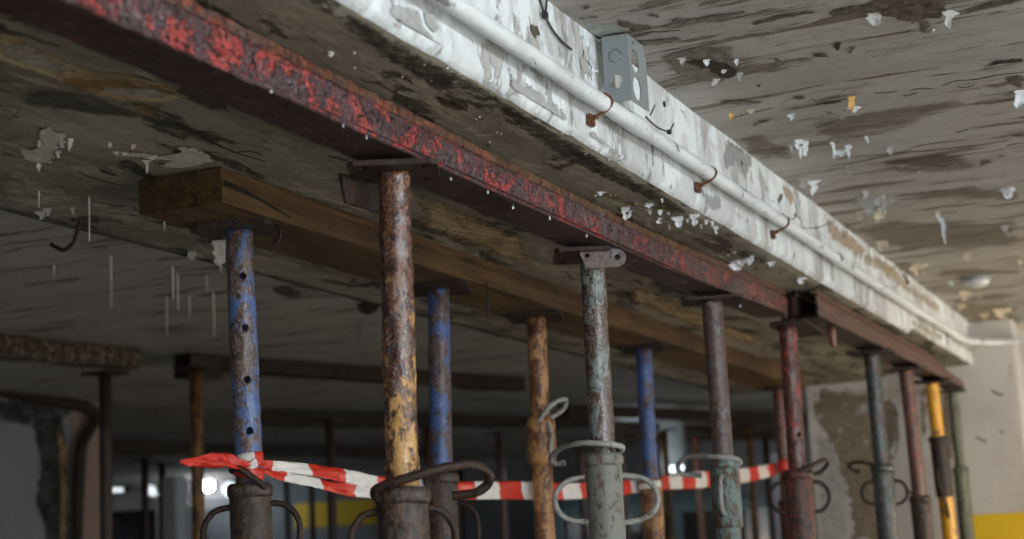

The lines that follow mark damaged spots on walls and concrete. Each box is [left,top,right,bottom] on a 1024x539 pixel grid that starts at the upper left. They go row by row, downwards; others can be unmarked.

spalling [831,0,1022,33]
spalling [344,15,527,119]
spalling [617,11,744,86]
corrosion [435,96,464,110]
peeling [1013,90,1024,108]
peeling [786,96,847,161]
peeling [20,127,74,177]
peeling [107,142,214,168]
peeling [829,142,852,159]
peeling [595,192,719,234]
peeling [721,251,776,270]
spalling [813,387,878,539]